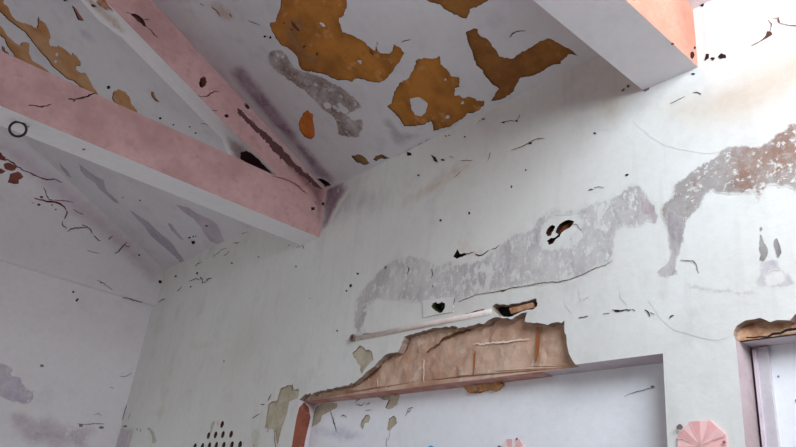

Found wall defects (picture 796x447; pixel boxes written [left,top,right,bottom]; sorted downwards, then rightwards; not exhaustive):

peeling [0,0,98,95]
peeling [107,86,137,112]
peeling [263,0,404,139]
peeling [429,0,488,18]
peeling [389,28,575,137]
crack [751,17,796,46]
crack [0,158,140,256]
damp [222,59,485,244]
damp [353,19,796,341]
damp [0,362,105,447]
damp [115,424,136,447]
peeling [267,386,299,442]